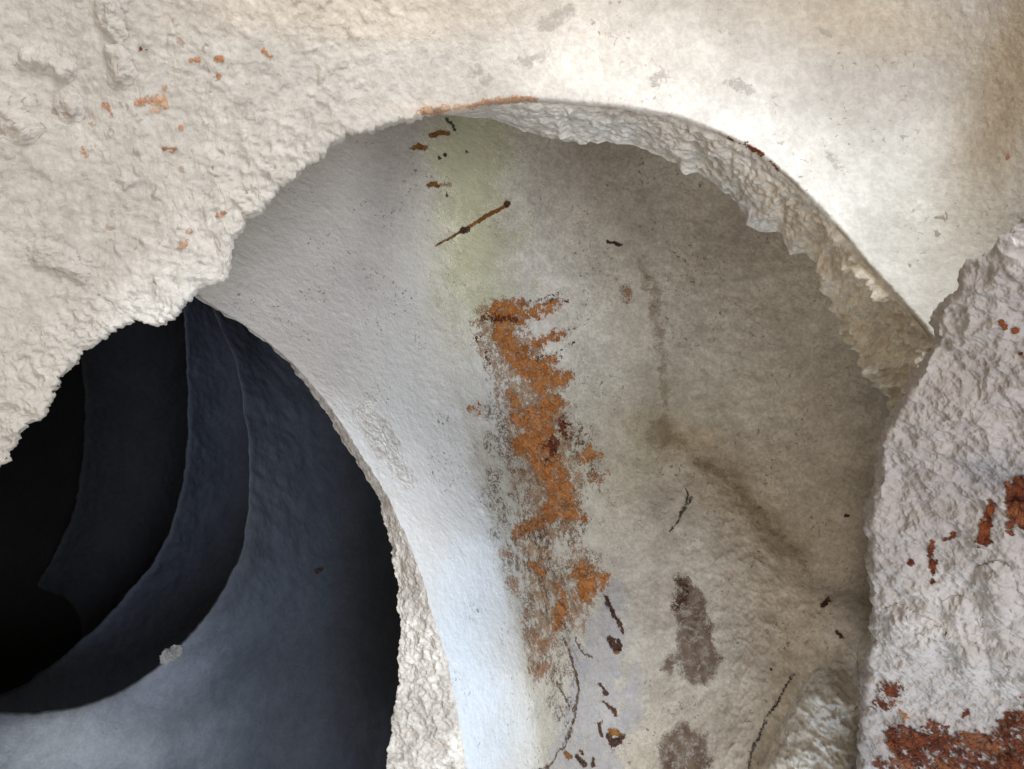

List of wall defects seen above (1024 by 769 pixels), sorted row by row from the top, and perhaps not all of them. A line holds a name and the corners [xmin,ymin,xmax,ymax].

rust [134,85,169,113]
rust [417,95,537,116]
rust [410,130,450,150]
rust [436,201,511,246]
spalling [352,395,419,489]
rust [465,292,613,685]
rust [974,476,1024,549]
rust [927,532,957,584]
leakage [659,574,724,686]
leakage [656,721,713,769]
rust [868,681,1024,769]